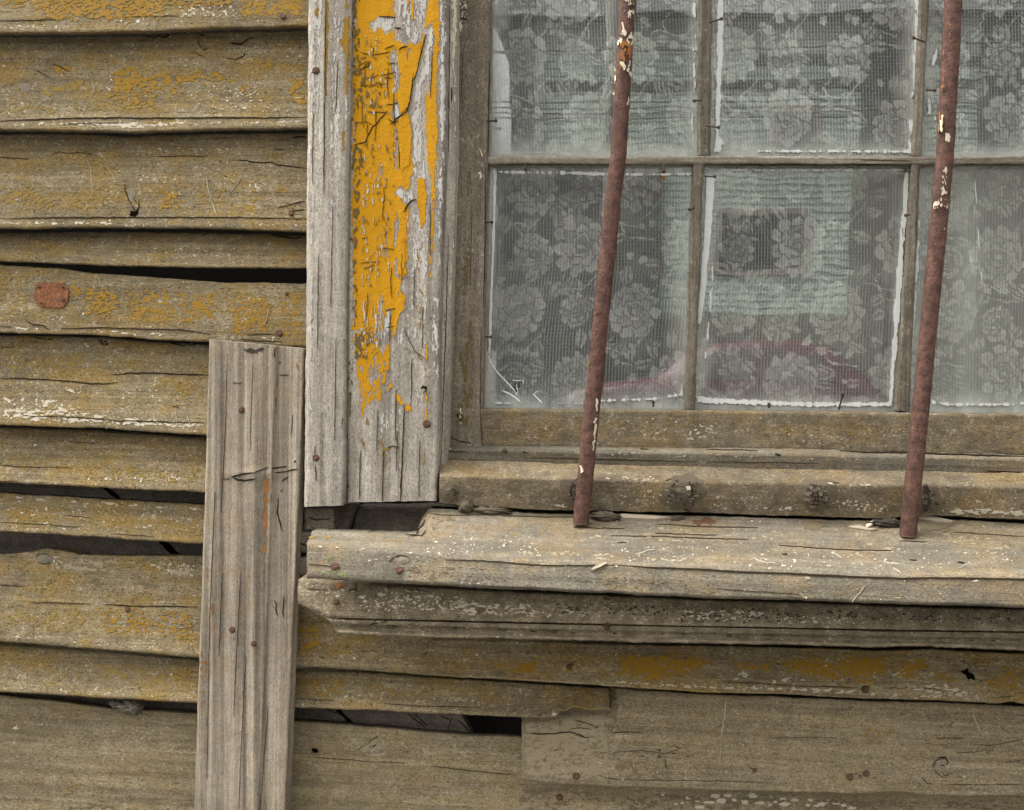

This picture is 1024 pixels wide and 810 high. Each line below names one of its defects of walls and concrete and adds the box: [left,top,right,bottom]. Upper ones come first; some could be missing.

peeling [0,0,466,467]
crack [0,0,481,810]